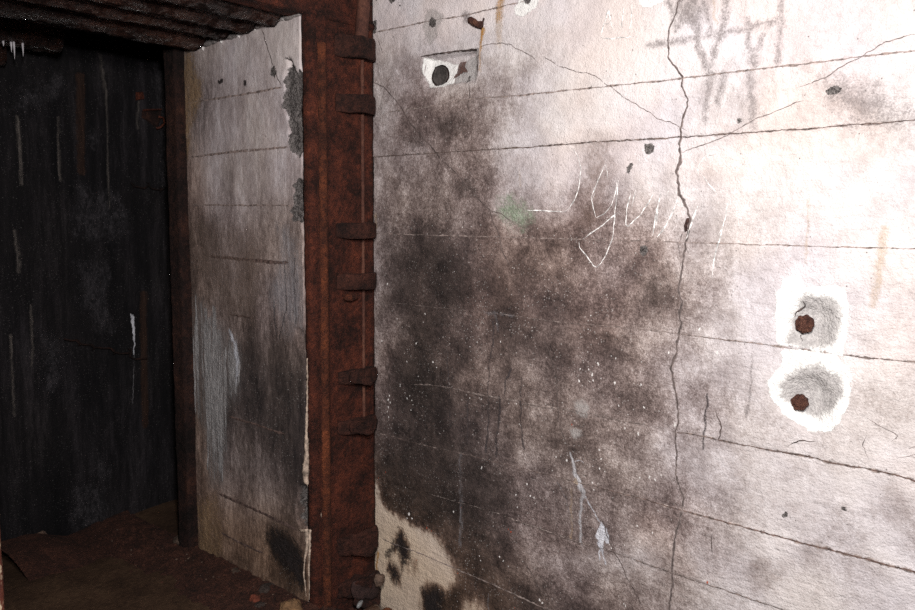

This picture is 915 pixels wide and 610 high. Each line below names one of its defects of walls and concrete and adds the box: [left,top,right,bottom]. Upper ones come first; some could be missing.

crack [373,82,513,267]
crack [481,1,914,610]
spalling [767,275,853,433]
rust [349,525,381,609]
water stain [570,453,609,565]